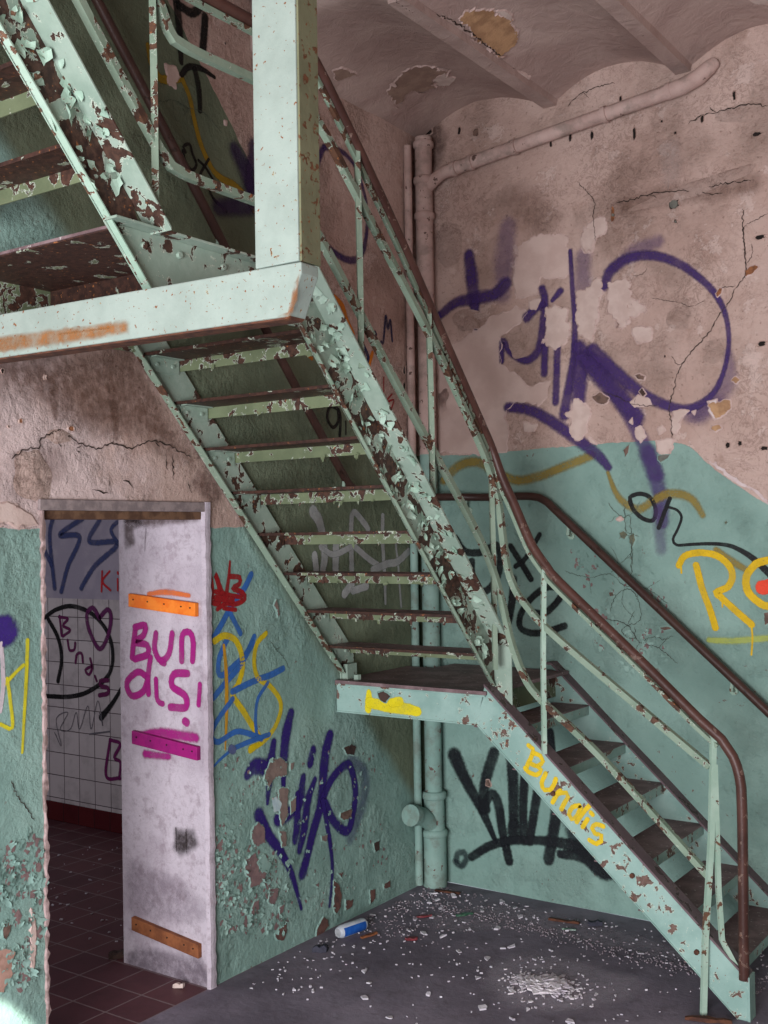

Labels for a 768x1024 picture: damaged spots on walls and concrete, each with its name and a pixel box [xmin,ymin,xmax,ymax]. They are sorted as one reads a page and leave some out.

peeling [0,0,123,197]
peeling [386,65,456,109]
flaking render [458,7,520,59]
crack [689,103,766,123]
crack [579,180,751,239]
peeling [306,286,352,389]
peeling [452,204,654,453]
crack [604,209,768,435]
crack [12,429,189,459]
peeling [349,359,490,660]
peeling [0,826,49,994]
peeling [215,740,390,942]